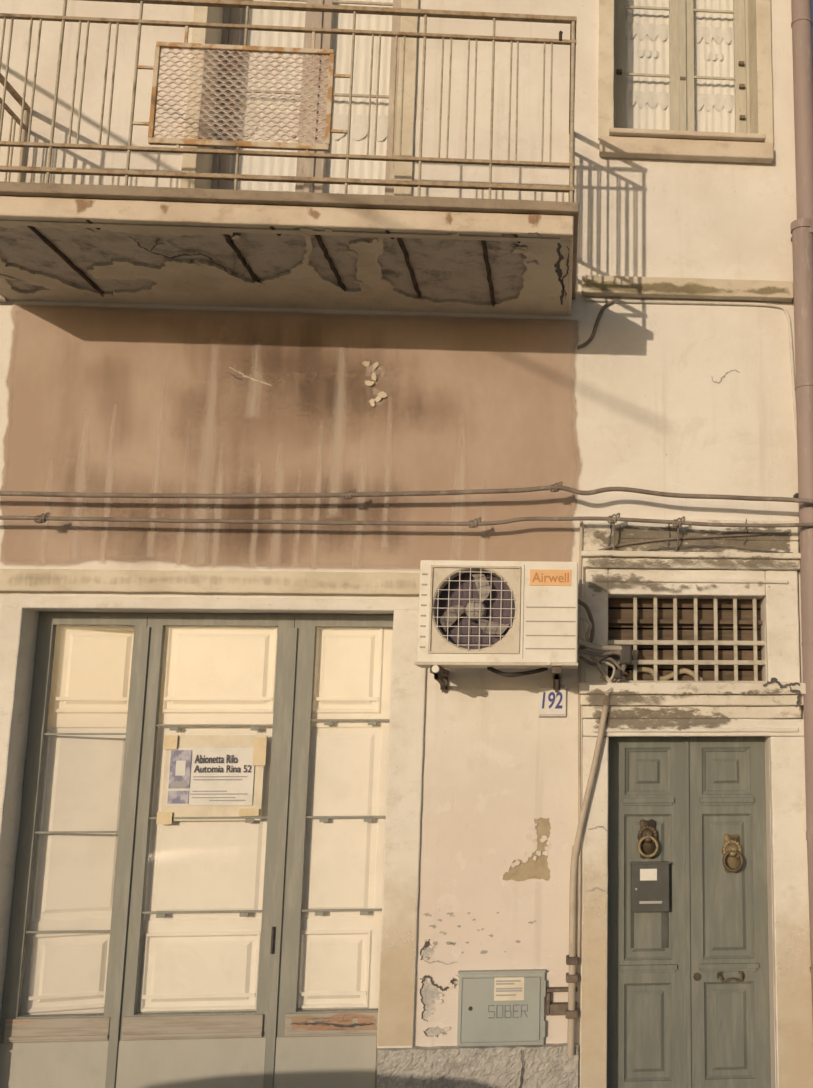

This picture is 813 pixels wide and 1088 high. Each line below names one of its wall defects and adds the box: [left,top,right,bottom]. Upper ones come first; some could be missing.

spalling [0,226,247,297]
spalling [309,228,378,292]
leakage [0,305,581,569]
leakage [586,525,797,596]
peeling [503,817,551,881]
spalling [420,912,469,960]
spalling [419,975,459,1038]